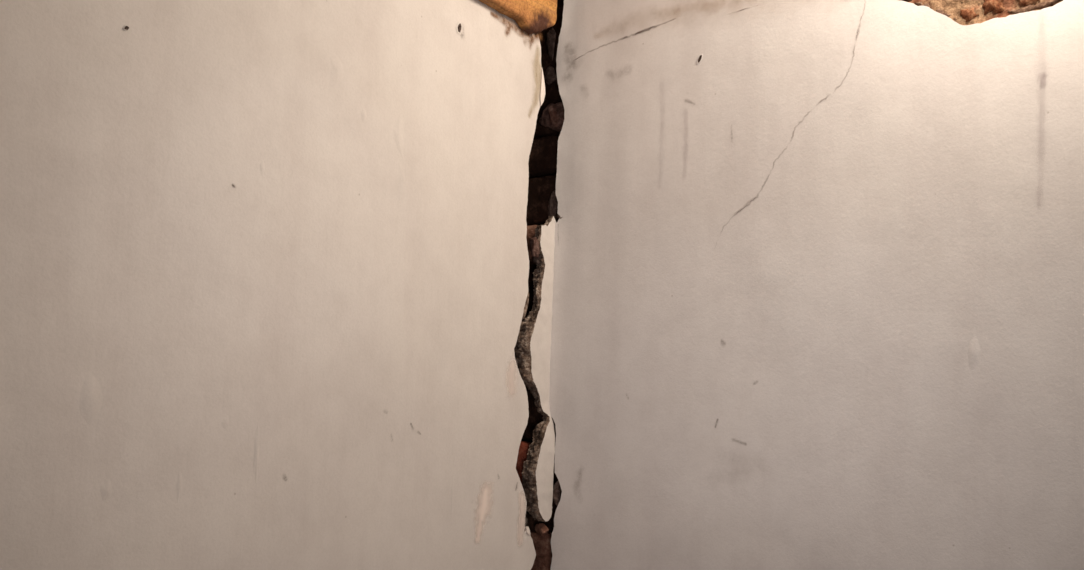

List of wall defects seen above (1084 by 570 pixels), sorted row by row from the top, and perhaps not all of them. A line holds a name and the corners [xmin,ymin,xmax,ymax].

spalling [901,0,1063,25]
crack [514,27,565,570]